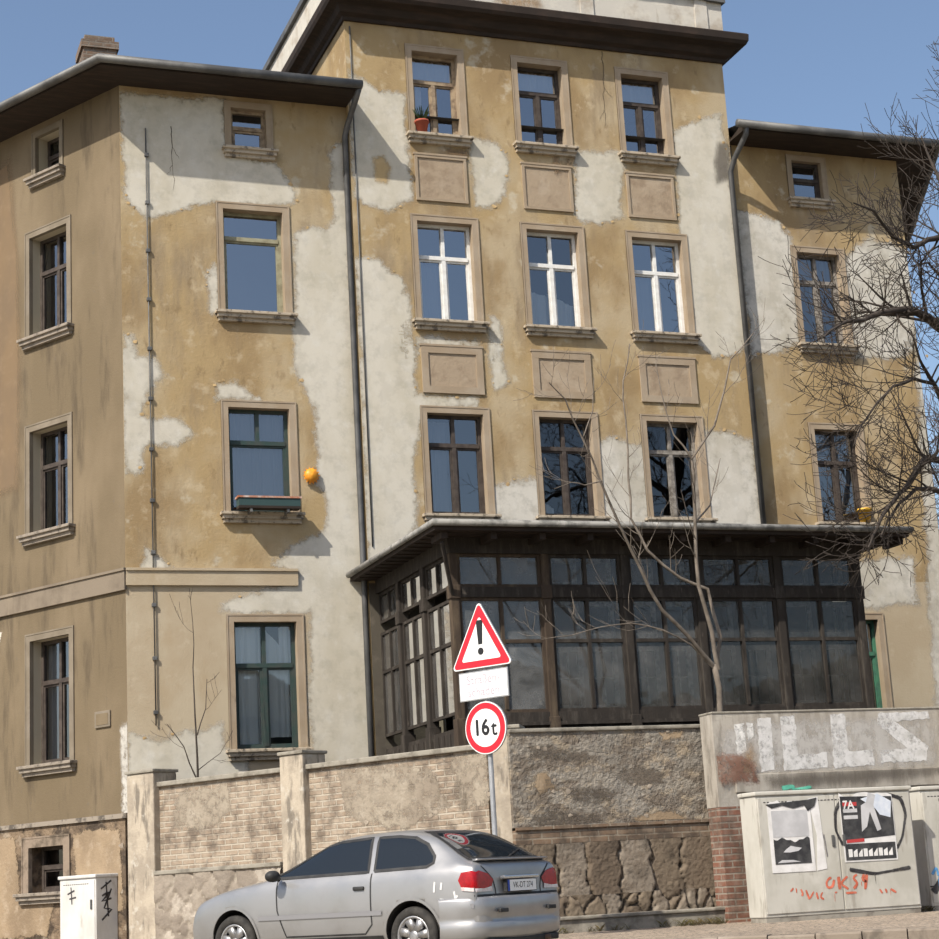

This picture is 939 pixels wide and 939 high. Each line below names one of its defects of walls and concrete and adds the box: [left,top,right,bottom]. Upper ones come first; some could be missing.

peeling [119,93,299,218]
peeling [574,150,625,224]
peeling [673,113,798,358]
peeling [123,333,193,474]
peeling [213,379,261,401]
peeling [222,74,510,830]
spalling [529,746,587,760]